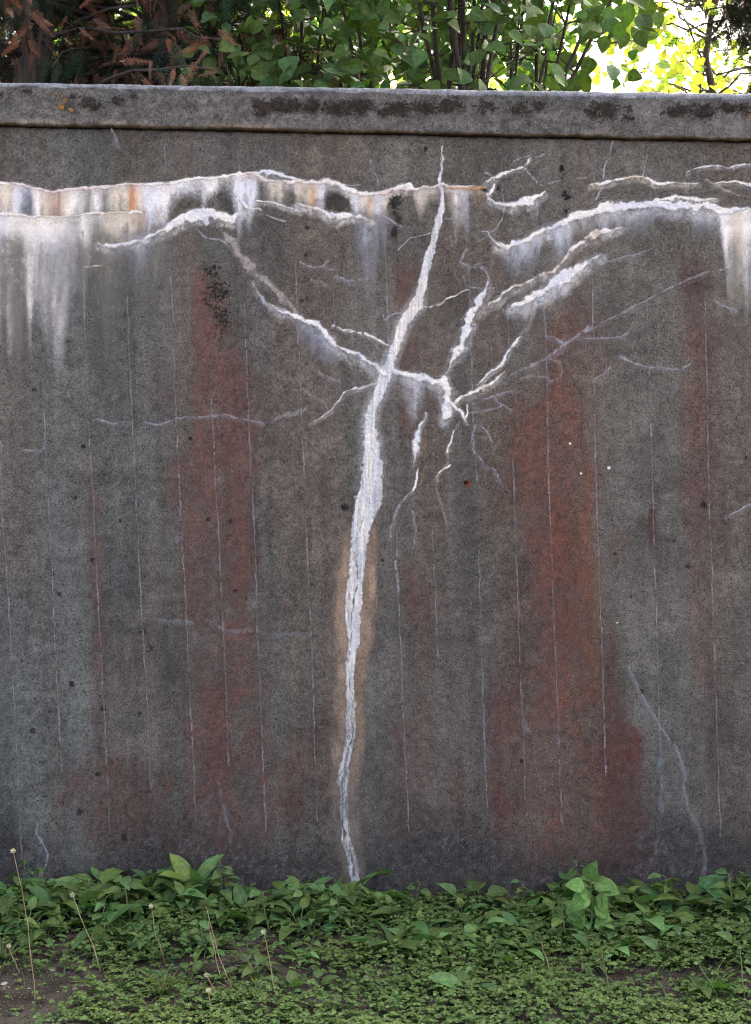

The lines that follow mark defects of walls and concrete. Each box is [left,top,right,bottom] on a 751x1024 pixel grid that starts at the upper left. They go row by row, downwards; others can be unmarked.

water stain [0,154,751,335]
crack [705,179,751,196]
crack [146,146,731,895]
water stain [331,526,377,890]